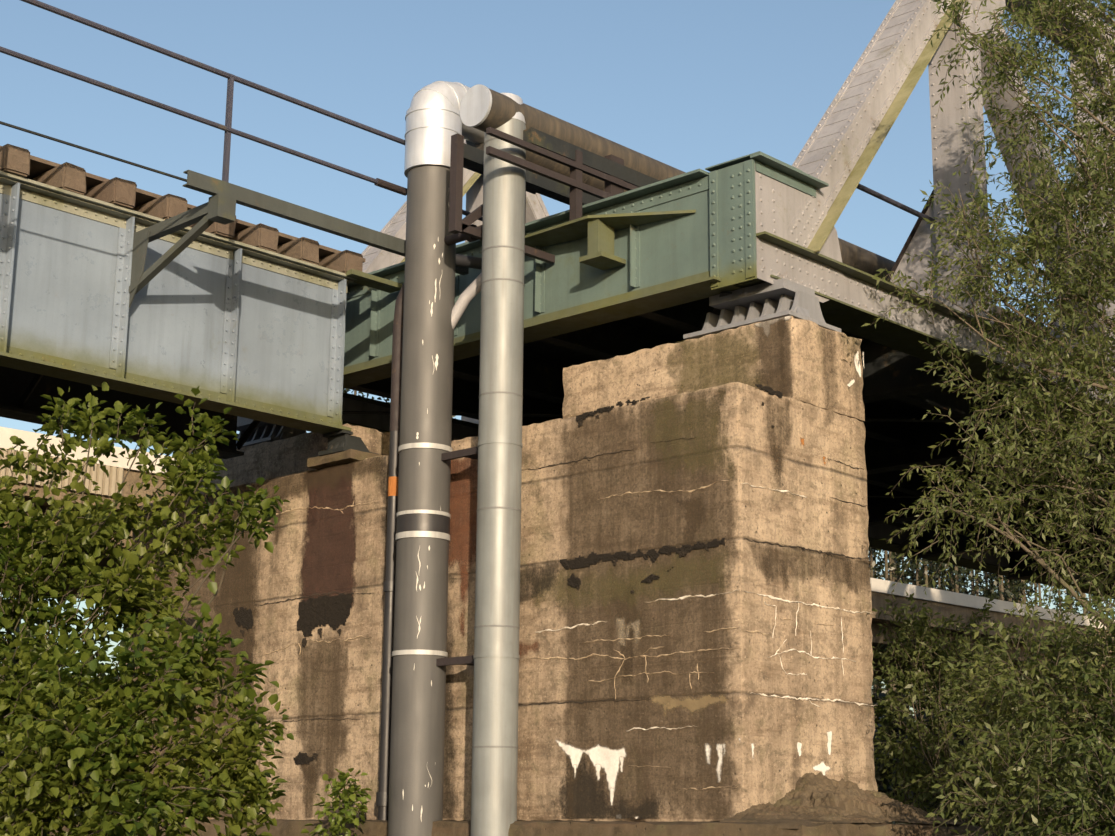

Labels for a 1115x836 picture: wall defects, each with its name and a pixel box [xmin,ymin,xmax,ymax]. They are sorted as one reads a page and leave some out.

spalling [576,397,650,427]
leakage [755,315,793,478]
leakage [848,351,864,387]
crack [598,478,869,507]
leakage [129,456,389,789]
leakage [298,639,347,818]
peeling [297,593,353,648]
leakage [443,603,458,818]
leakage [520,390,754,819]
spalling [560,538,725,594]
crack [518,590,875,731]
leakage [752,545,870,589]